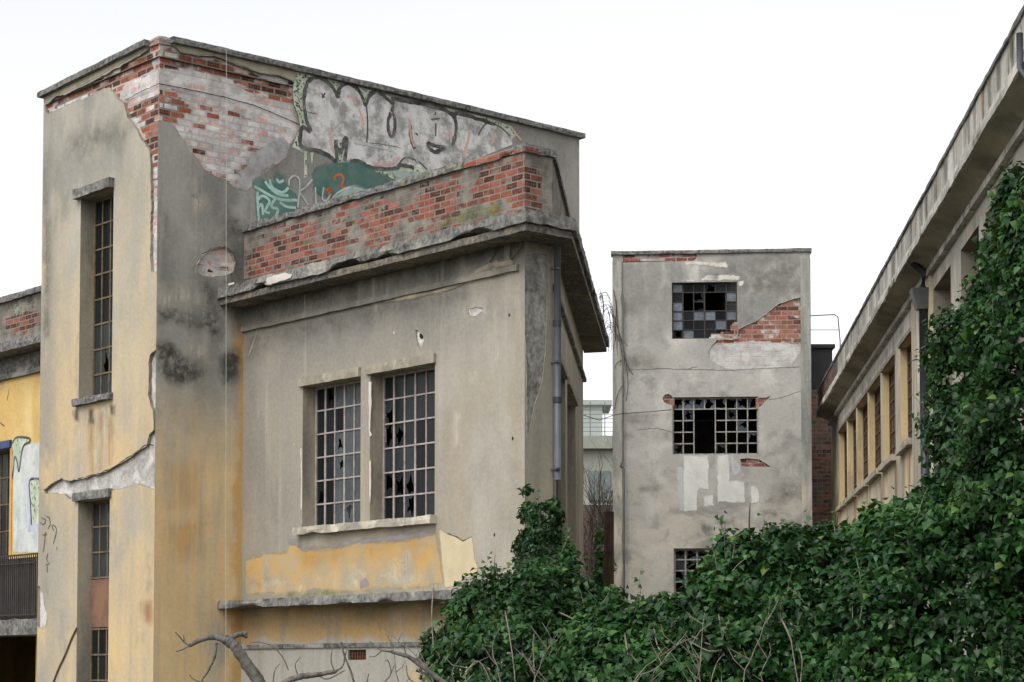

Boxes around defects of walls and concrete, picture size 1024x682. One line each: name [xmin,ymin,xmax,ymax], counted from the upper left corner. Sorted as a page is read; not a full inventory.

spalling [45,38,300,272]
damp [223,353,239,380]
spalling [708,298,801,370]
spalling [662,394,675,407]
spalling [45,432,155,502]
spalling [740,458,770,467]
peeling [245,530,477,595]